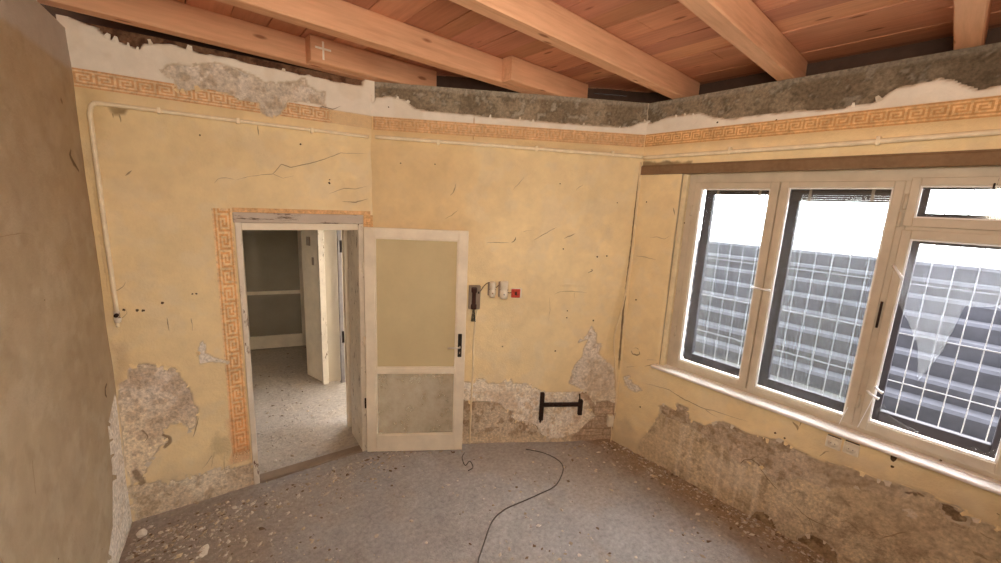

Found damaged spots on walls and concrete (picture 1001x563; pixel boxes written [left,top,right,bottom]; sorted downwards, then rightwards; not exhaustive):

spalling [646,403,943,563]
spalling [930,497,1001,541]